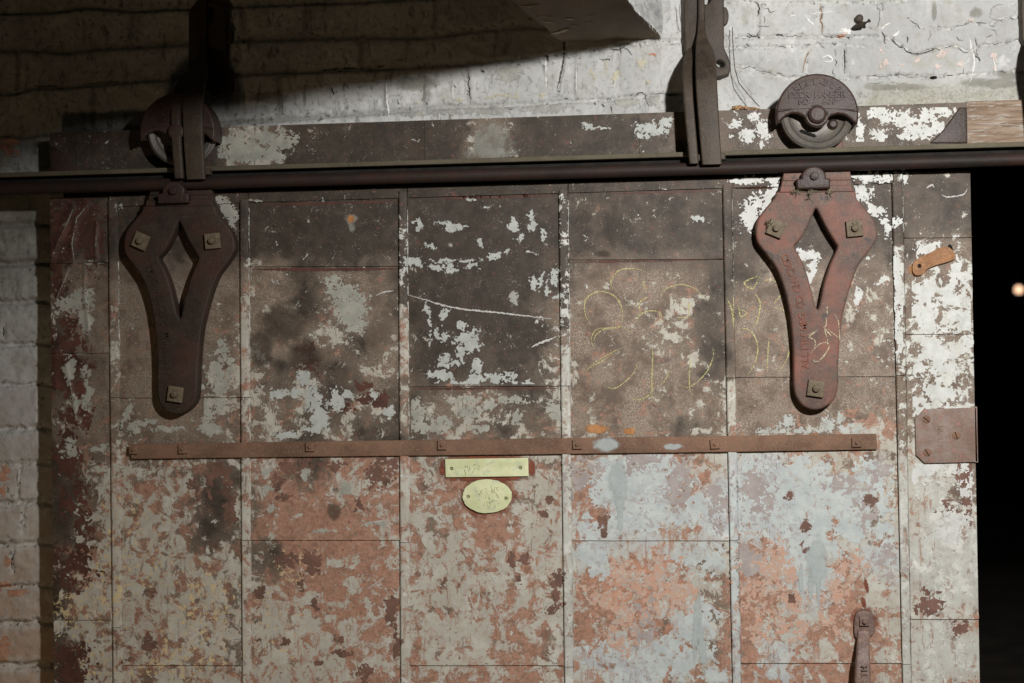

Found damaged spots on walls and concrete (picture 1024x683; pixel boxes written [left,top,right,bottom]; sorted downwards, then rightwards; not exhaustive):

crack [740,1,1018,99]
peeling [727,112,773,150]
peeling [856,107,957,142]
peeling [727,175,782,235]
peeling [399,209,547,274]
peeling [528,264,565,299]
peeling [796,247,822,283]
peeling [411,301,561,434]
peeling [257,456,404,527]
peeling [912,463,972,546]
rust [851,579,878,626]
peeling [914,586,970,640]